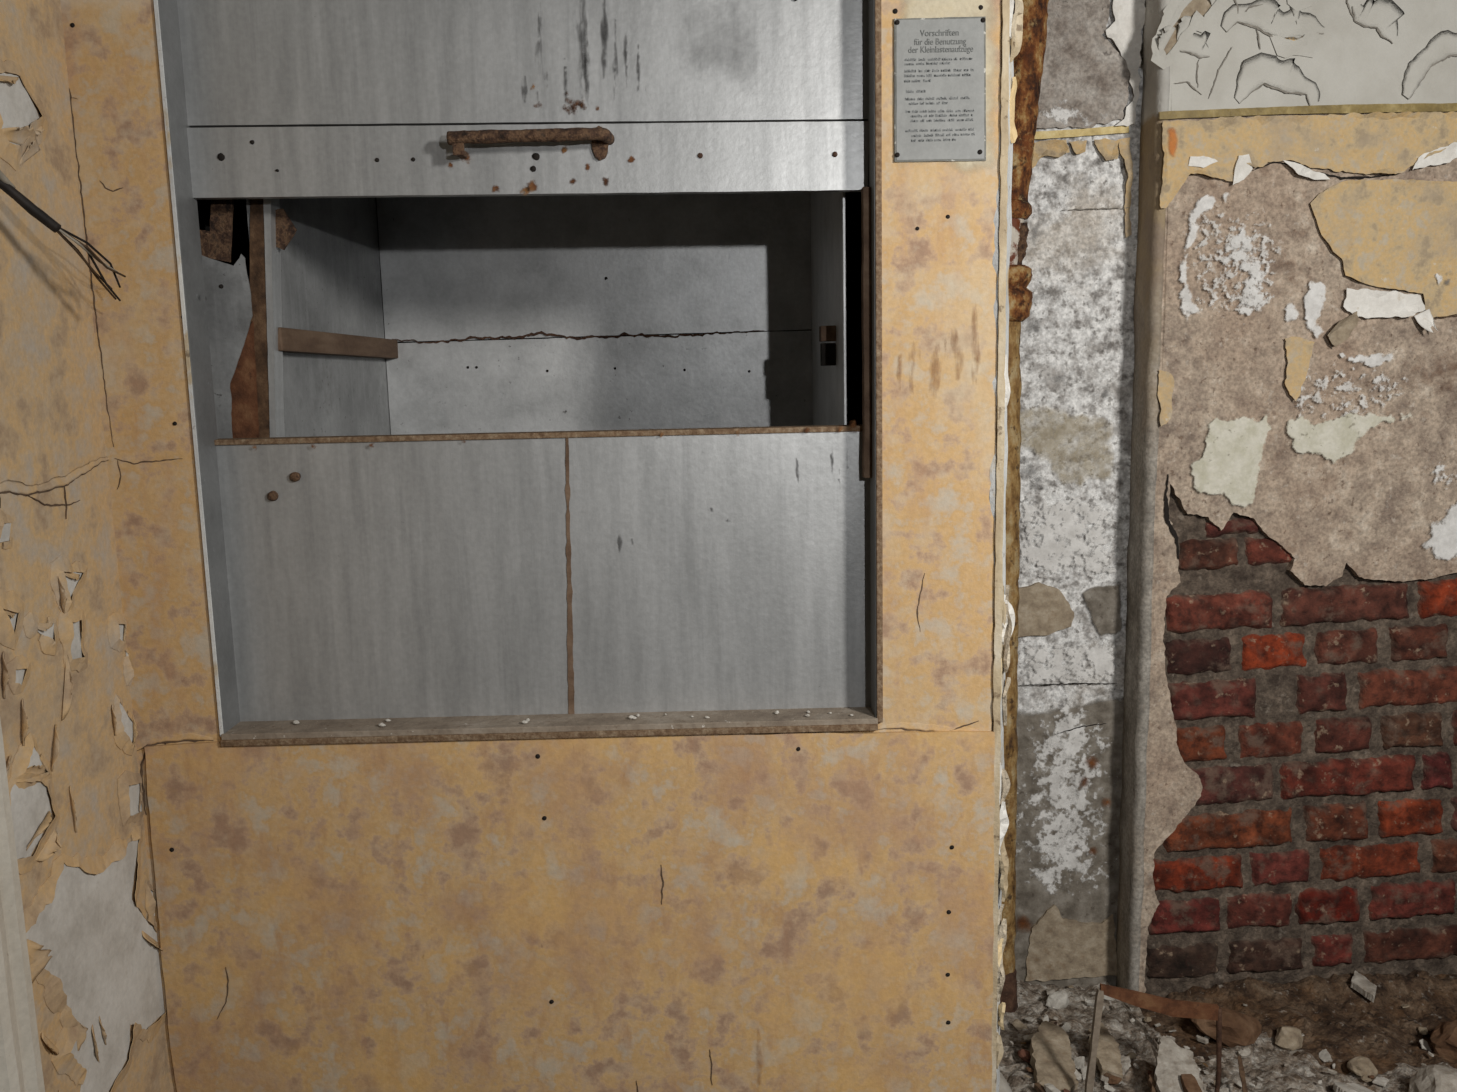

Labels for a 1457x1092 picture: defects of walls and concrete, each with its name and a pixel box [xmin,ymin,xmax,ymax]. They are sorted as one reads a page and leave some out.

peeling [0,59,49,171]
crack [0,89,181,519]
water stain [564,3,639,91]
peeling [905,0,1024,170]
rust [1017,222,1029,265]
flaking render [1032,0,1226,237]
peeling [1159,111,1457,333]
crack [1175,0,1457,105]
peeling [0,555,167,1092]
peeling [996,762,1010,1082]
flaking render [1001,582,1074,726]
flaking render [1144,487,1457,997]